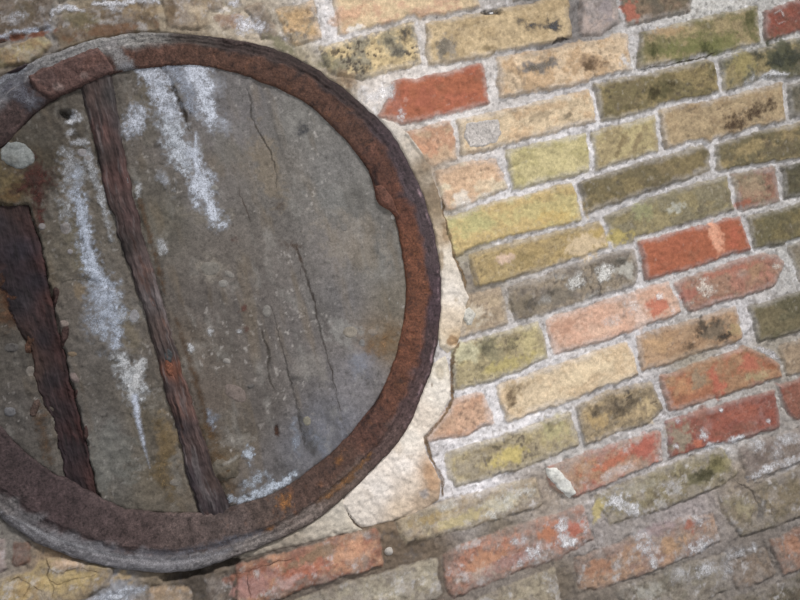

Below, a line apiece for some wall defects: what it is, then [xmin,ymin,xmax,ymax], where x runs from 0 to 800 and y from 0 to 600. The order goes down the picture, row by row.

leakage [122,65,227,228]
leakage [60,148,148,445]
leakage [228,471,297,504]